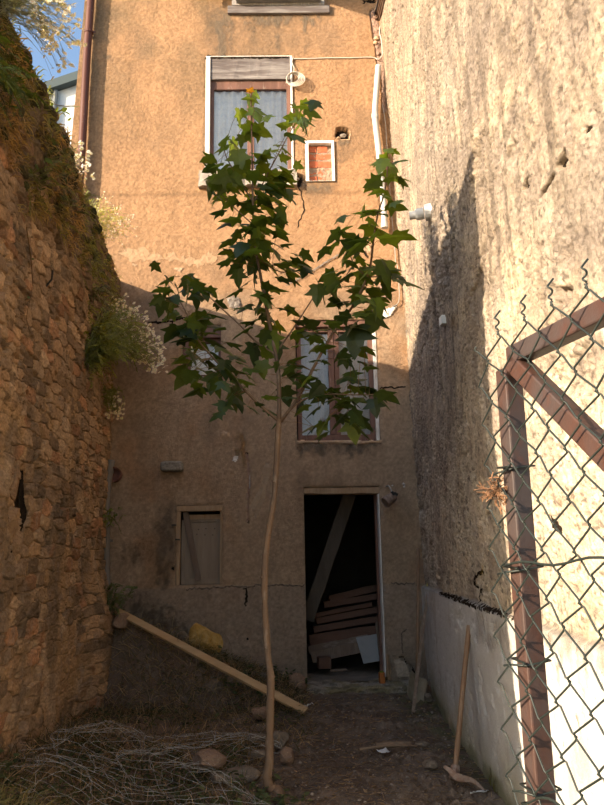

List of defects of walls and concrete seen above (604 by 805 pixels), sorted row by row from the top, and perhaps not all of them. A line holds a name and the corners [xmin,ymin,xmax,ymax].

crack [186,584,305,606]
crack [438,569,514,621]